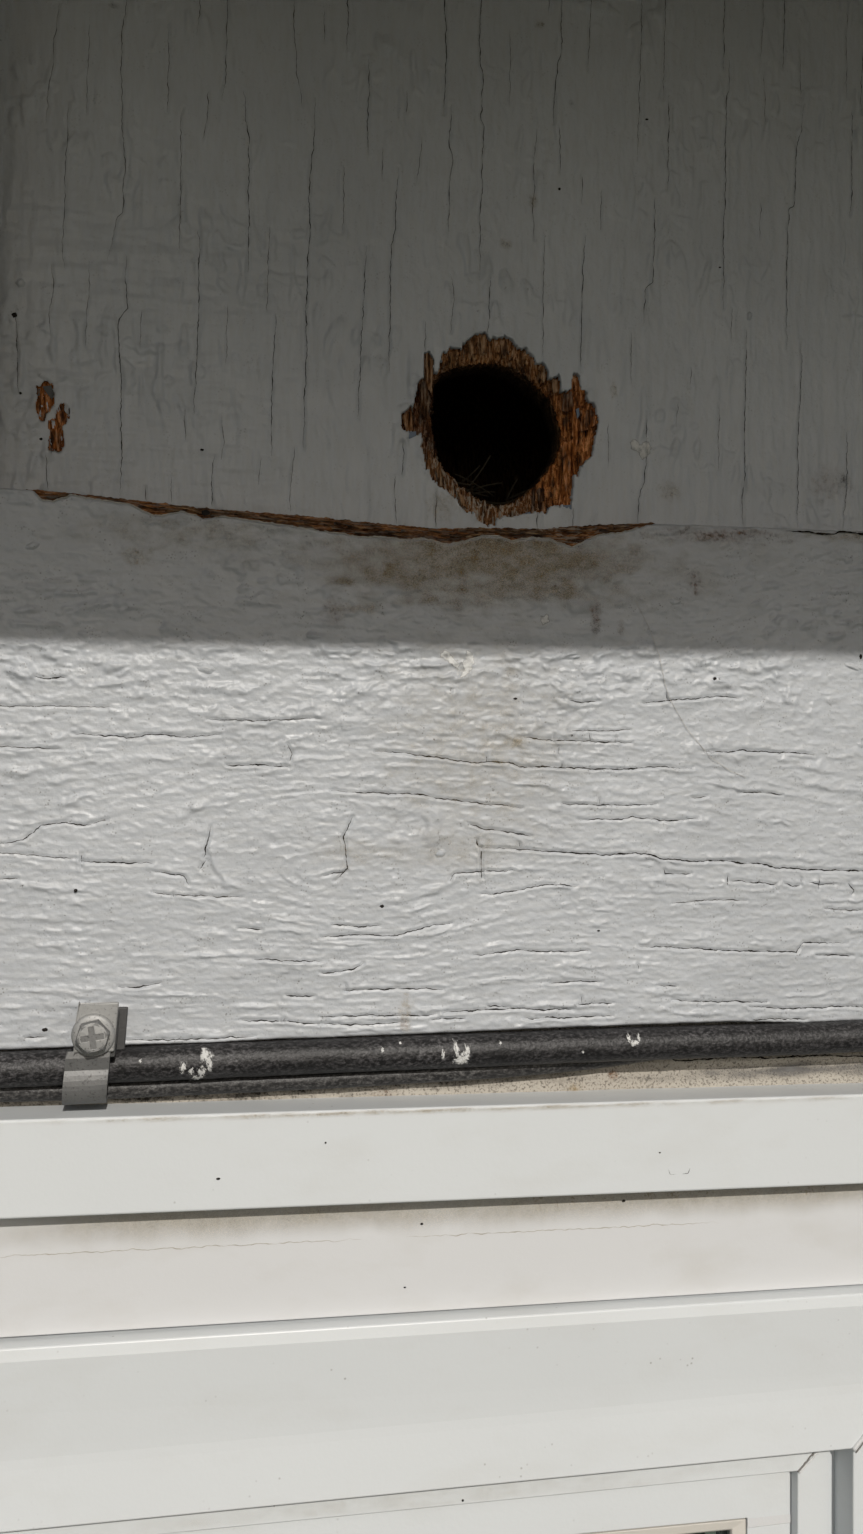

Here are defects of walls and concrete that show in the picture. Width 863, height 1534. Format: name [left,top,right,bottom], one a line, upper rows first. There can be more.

peeling [36,381,70,453]
crack [15,2,172,502]
crack [167,0,511,511]
peeling [215,515,638,548]
crack [532,1,602,363]
crack [630,0,670,364]
crack [718,0,863,535]
crack [0,676,320,767]
crack [2,820,611,1041]
crack [323,695,863,1062]